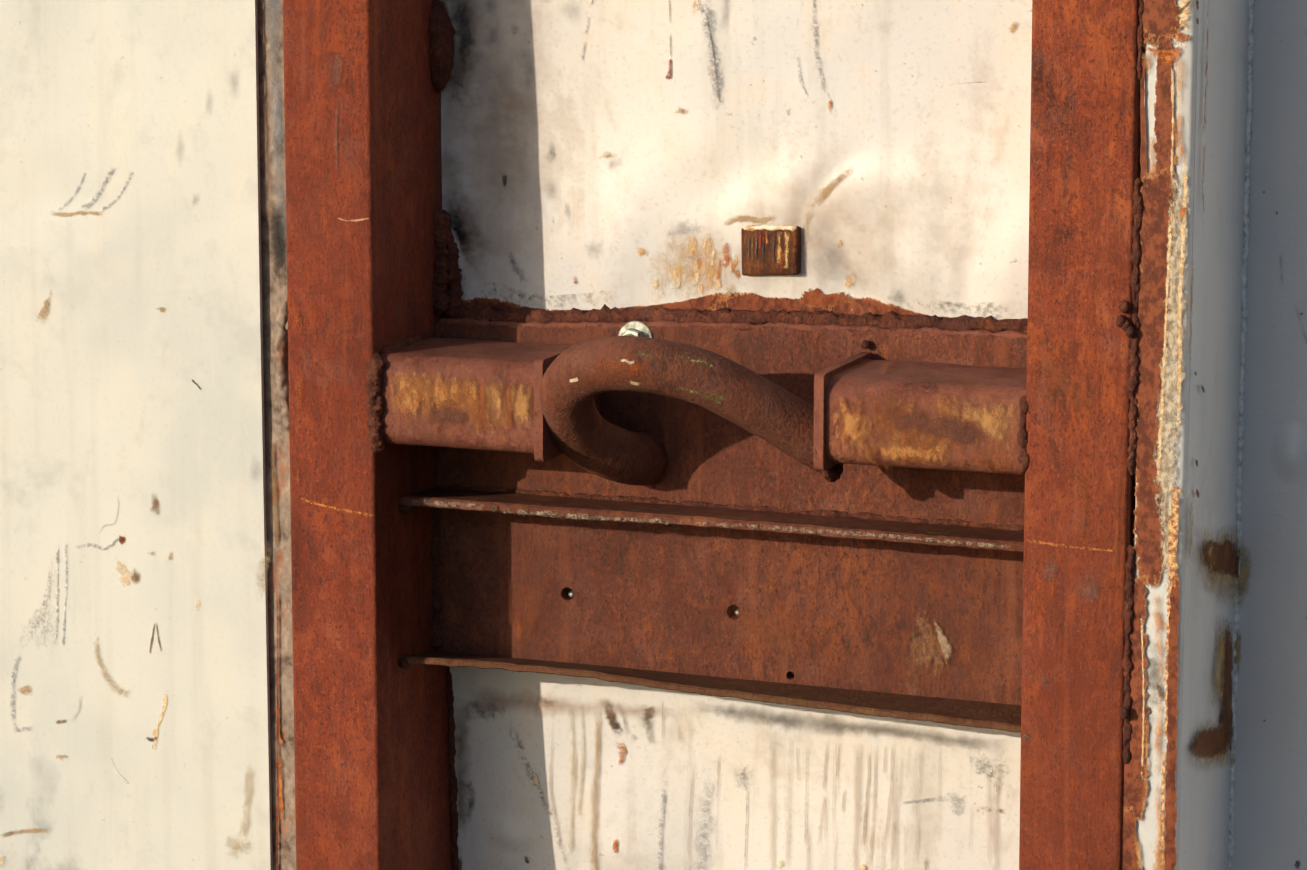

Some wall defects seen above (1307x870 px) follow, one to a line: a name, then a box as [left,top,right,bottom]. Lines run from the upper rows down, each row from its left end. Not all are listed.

corrosion [259,81,272,216]
corrosion [460,297,590,313]
corrosion [618,231,954,320]
corrosion [607,359,639,386]
peeling [1122,0,1191,870]
corrosion [271,450,279,543]
corrosion [1189,489,1249,595]
corrosion [276,591,284,870]
corrosion [1135,575,1240,870]